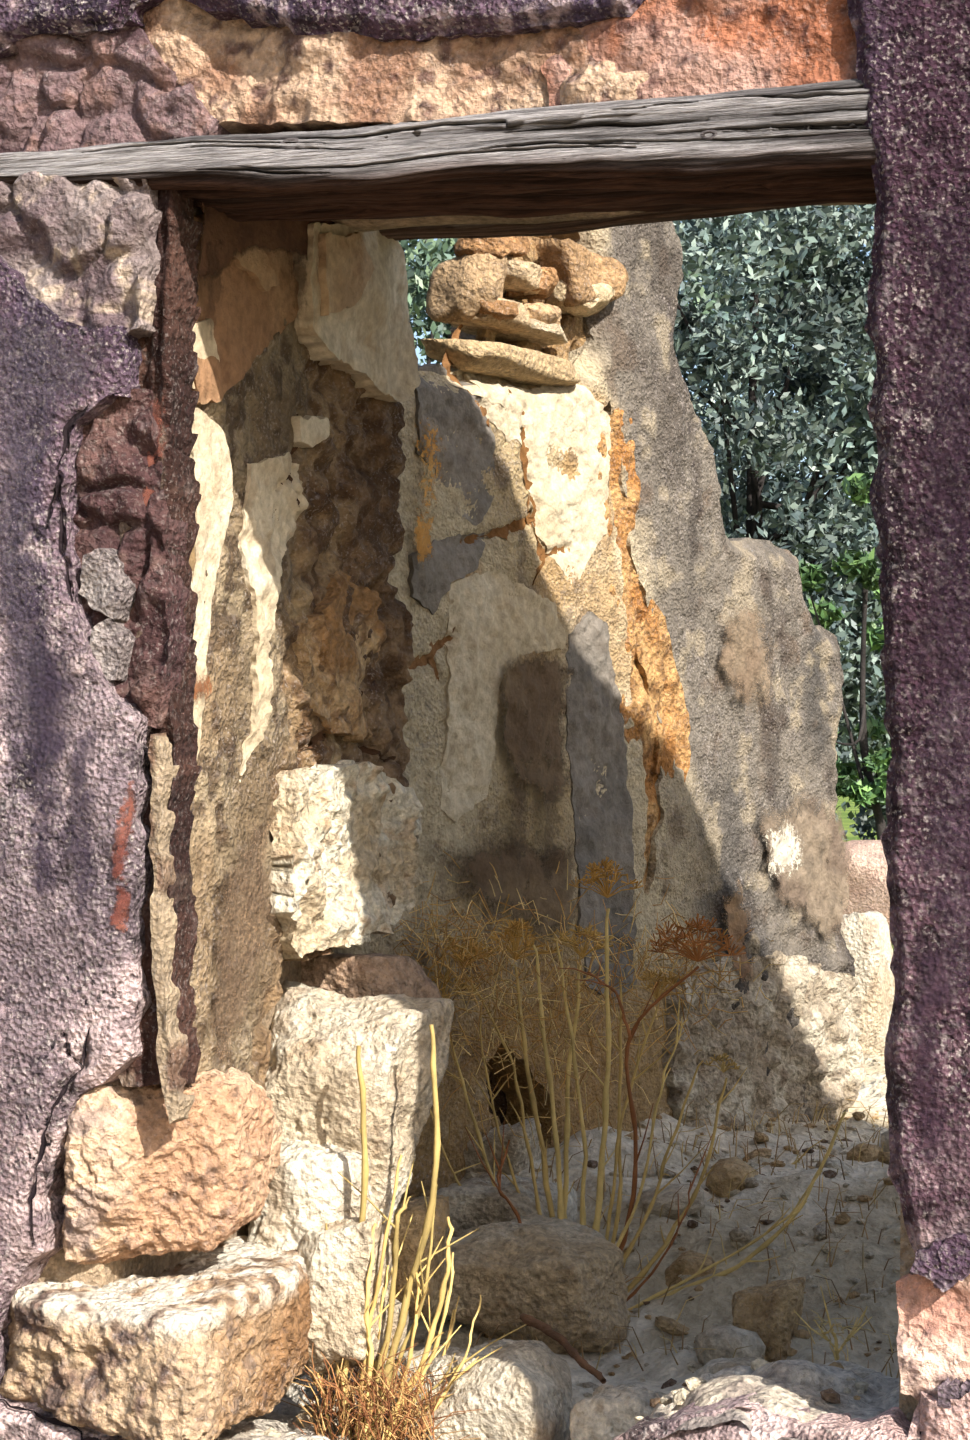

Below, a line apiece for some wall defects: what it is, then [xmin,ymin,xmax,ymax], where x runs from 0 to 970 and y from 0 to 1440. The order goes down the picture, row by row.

spalling [0,0,857,153]
spalling [0,171,163,339]
peeling [896,1233,970,1408]
crack [0,1399,99,1440]